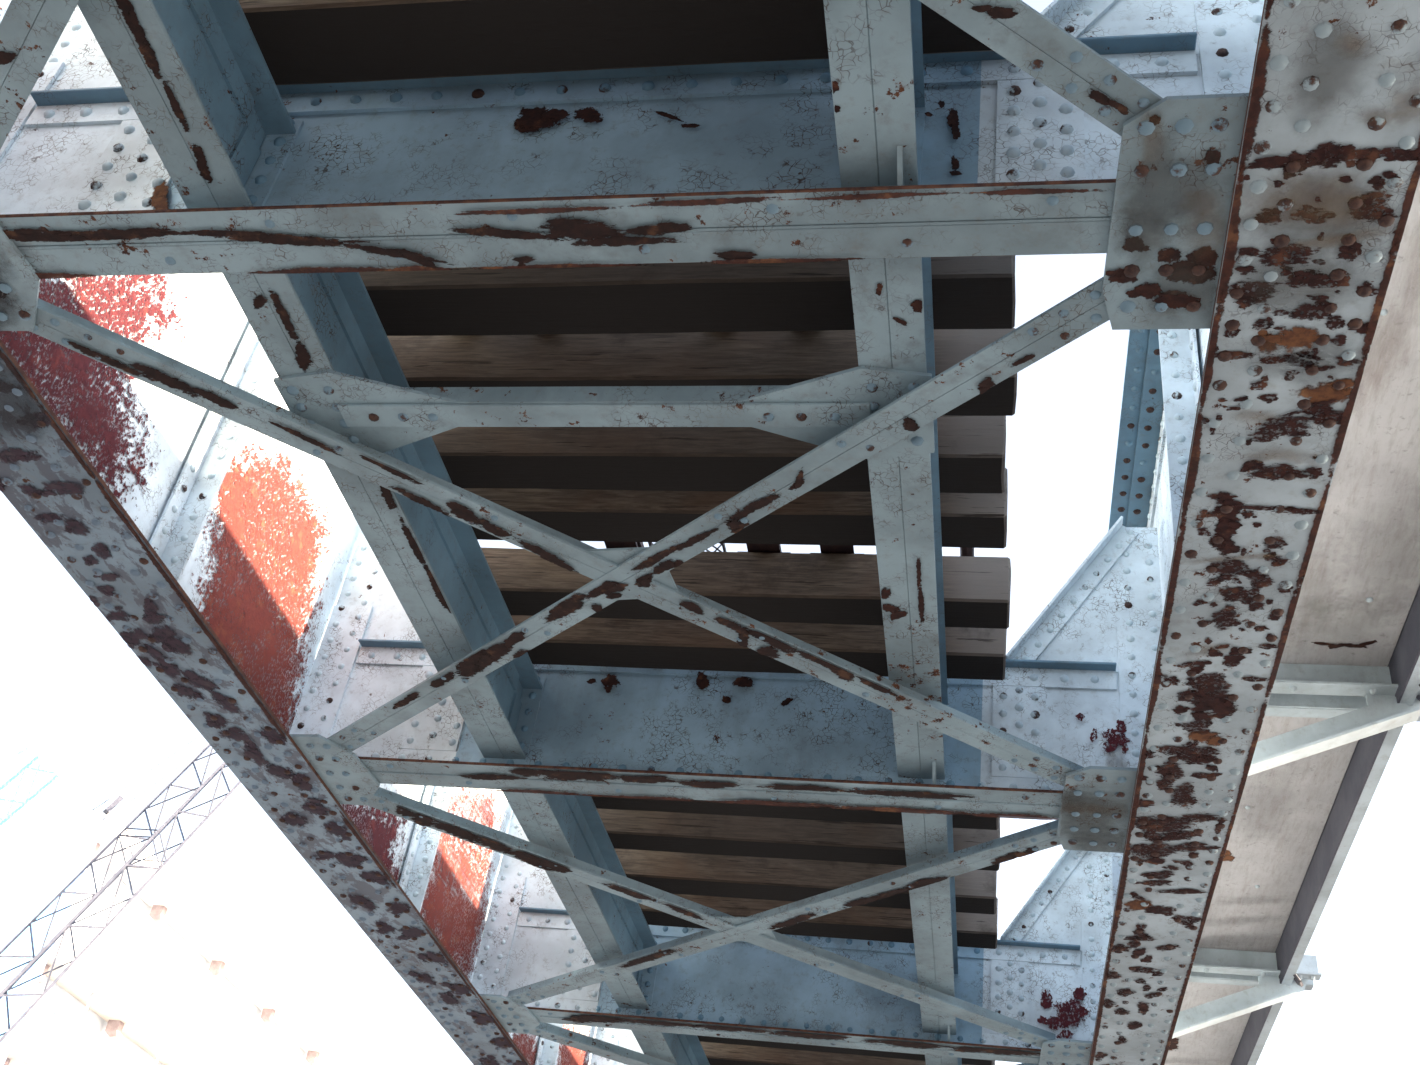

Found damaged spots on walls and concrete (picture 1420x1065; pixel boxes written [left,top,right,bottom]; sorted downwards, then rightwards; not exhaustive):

corrosion [248,263,646,274]
corrosion [455,188,1102,215]
corrosion [0,350,286,737]
corrosion [1037,0,1274,1065]
corrosion [1161,136,1420,1065]
corrosion [335,804,396,888]
corrosion [415,913,528,1065]